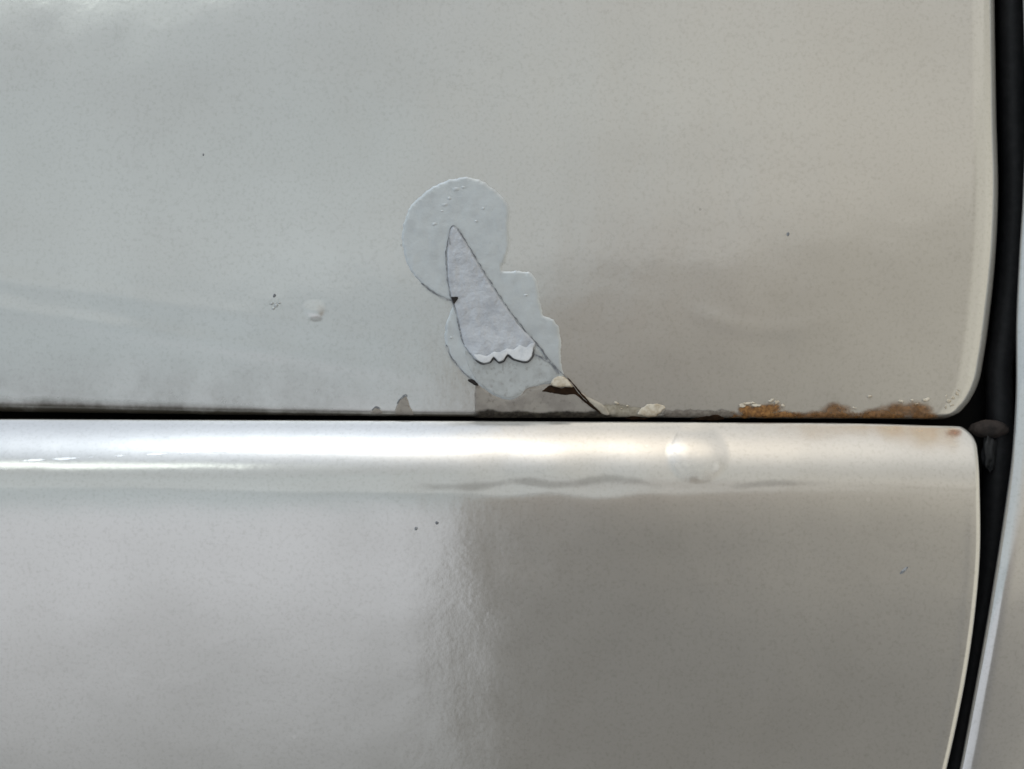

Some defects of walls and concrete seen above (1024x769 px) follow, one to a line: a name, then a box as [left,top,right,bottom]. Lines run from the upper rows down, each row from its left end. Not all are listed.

peeling [402,177,733,421]
peeling [395,394,413,415]
rust [730,395,936,419]